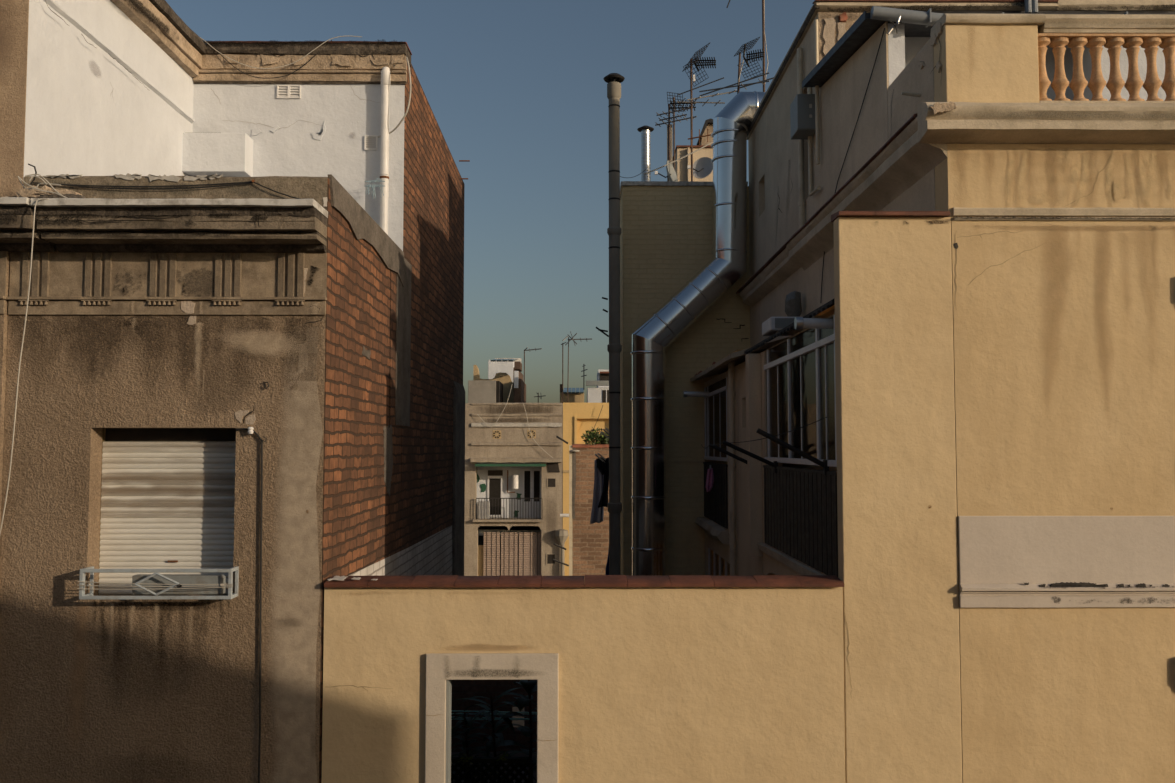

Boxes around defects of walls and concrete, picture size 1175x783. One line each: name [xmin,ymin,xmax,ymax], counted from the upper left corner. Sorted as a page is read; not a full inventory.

crack [955,231,1046,310]
leakage [929,144,1175,425]
leakage [100,437,236,520]
leakage [127,301,323,783]
leakage [94,600,222,662]